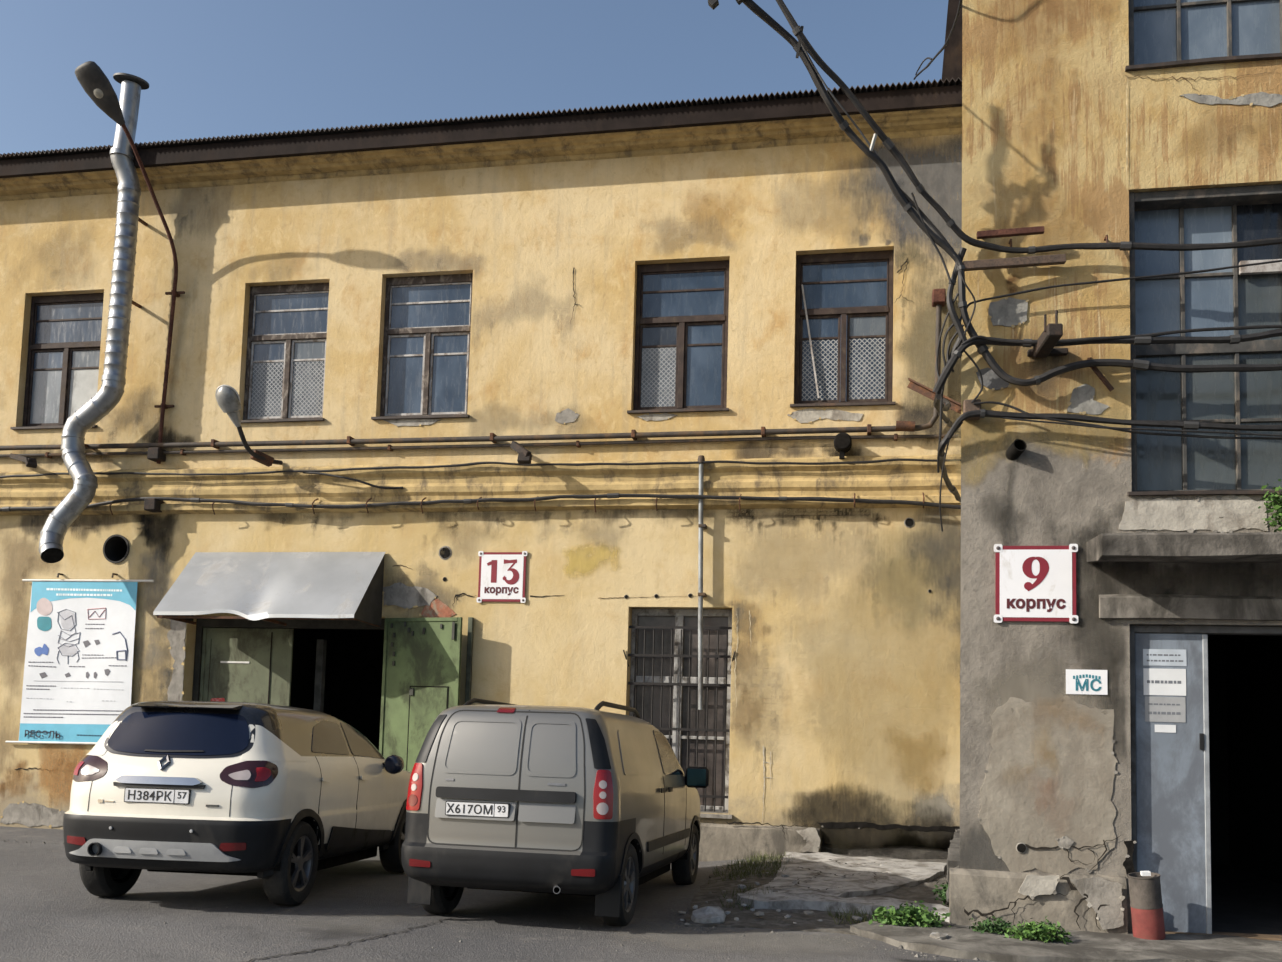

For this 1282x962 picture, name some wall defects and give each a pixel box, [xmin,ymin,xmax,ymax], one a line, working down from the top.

peeling [1180,92,1282,107]
water stain [862,139,962,259]
peeling [988,297,1029,328]
water stain [902,281,961,412]
peeling [1064,384,1109,415]
peeling [788,408,863,423]
spalling [439,546,452,560]
peeling [383,577,456,618]
water stain [914,794,954,822]
peeling [976,695,1137,930]
crack [964,835,1121,930]